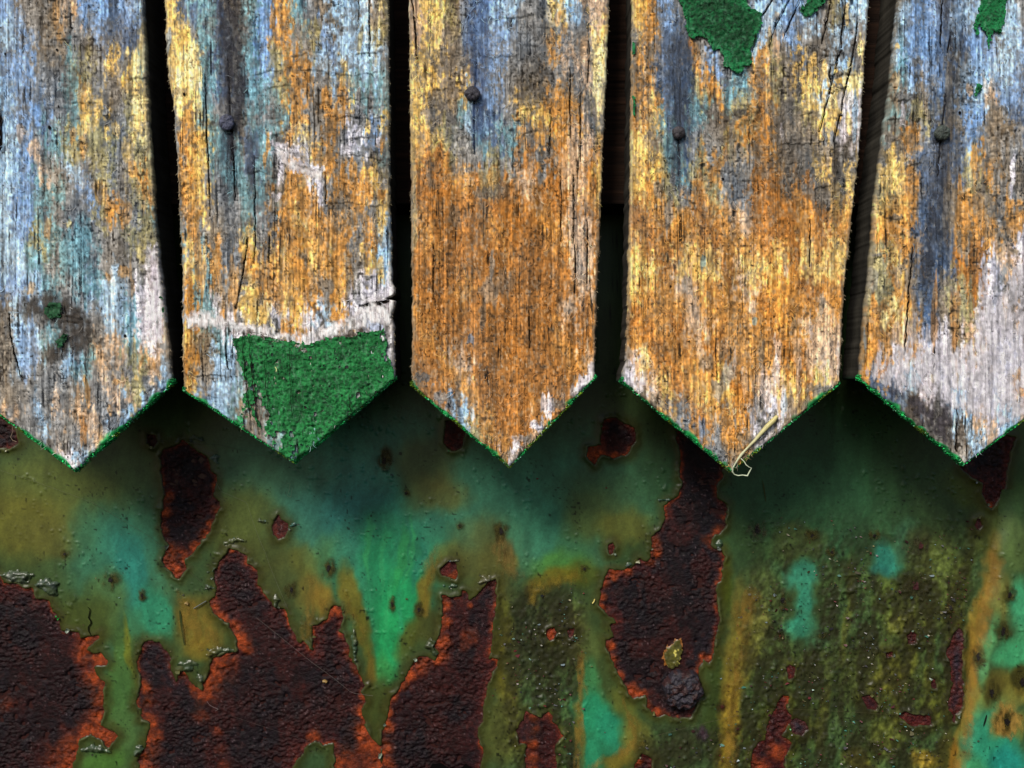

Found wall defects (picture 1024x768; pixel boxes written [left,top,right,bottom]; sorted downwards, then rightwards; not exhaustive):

crack [819,0,858,140]
corrosion [147,435,220,579]
corrosion [587,418,636,464]
corrosion [599,431,727,718]
corrosion [961,436,1015,530]
corrosion [0,576,118,768]
corrosion [136,549,498,768]
corrosion [516,711,563,768]
corrosion [751,696,808,768]
corrosion [946,628,986,722]